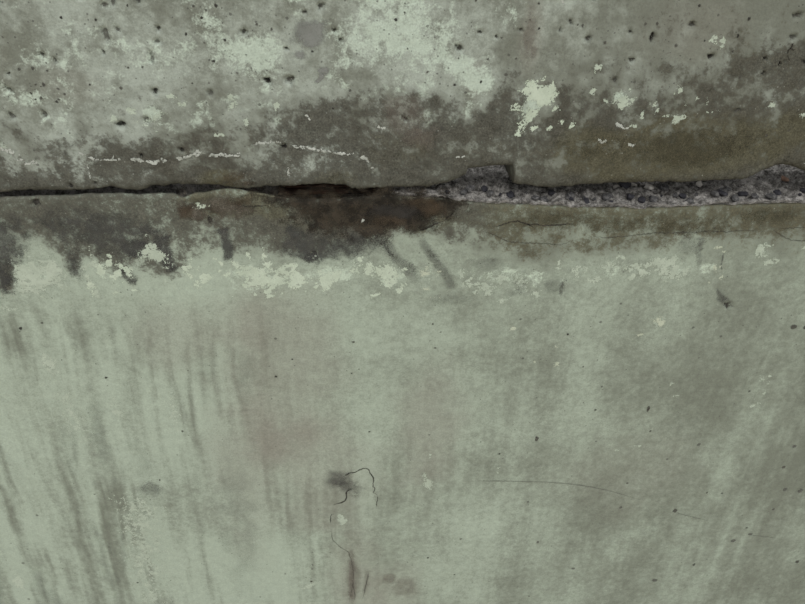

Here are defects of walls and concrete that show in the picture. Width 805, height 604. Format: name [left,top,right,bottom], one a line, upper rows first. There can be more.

leakage [0,219,29,290]
leakage [42,214,176,272]
leakage [218,228,233,260]
leakage [283,227,393,262]
crack [330,468,378,522]